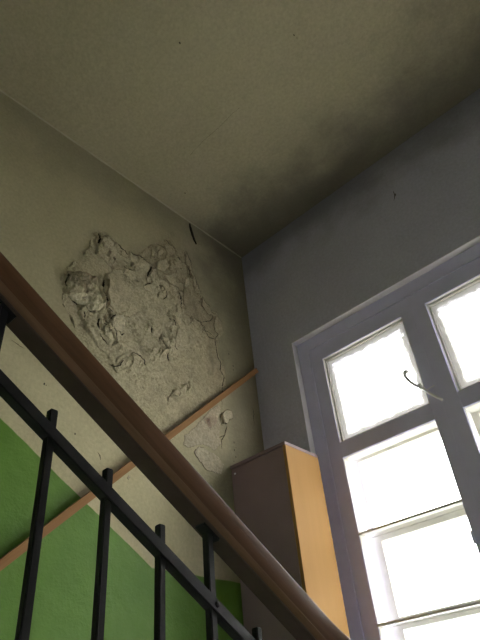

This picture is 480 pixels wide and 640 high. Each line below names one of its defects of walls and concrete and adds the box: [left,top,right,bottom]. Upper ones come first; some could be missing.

peeling [60,230,233,474]